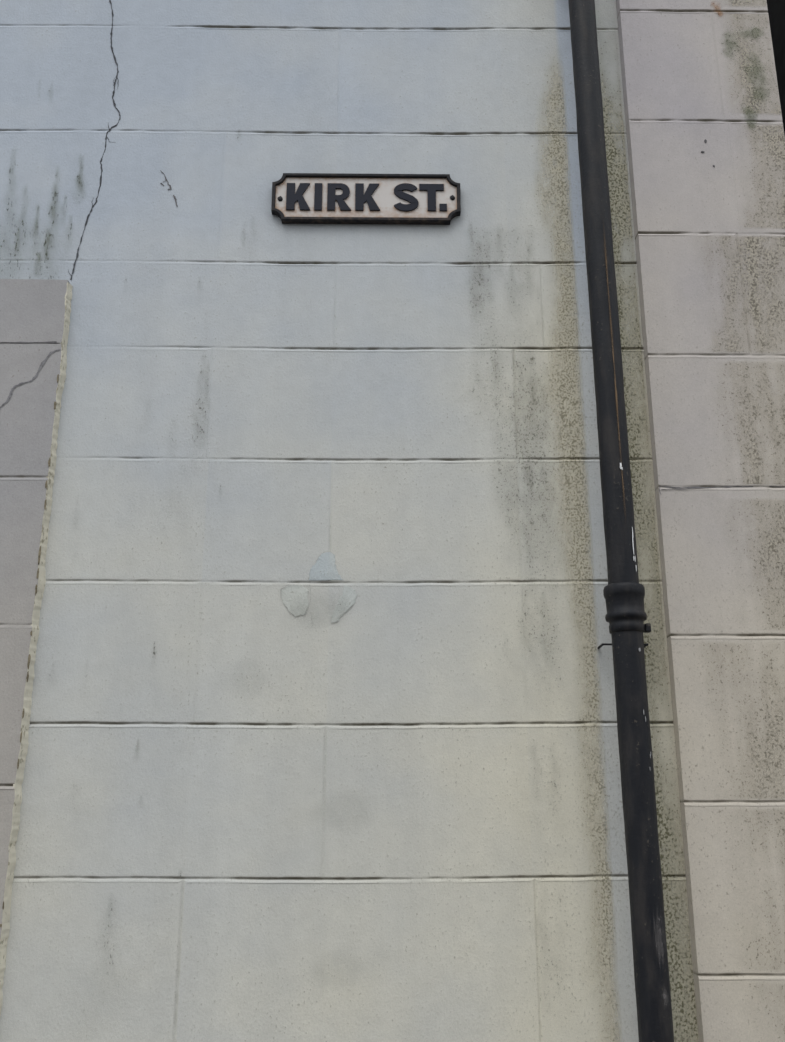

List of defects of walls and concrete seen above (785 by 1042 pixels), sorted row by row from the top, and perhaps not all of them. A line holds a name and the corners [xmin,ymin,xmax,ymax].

crack [68,0,121,280]
leakage [709,0,785,484]
crack [0,341,61,408]
leakage [730,501,785,629]
leakage [708,643,785,844]